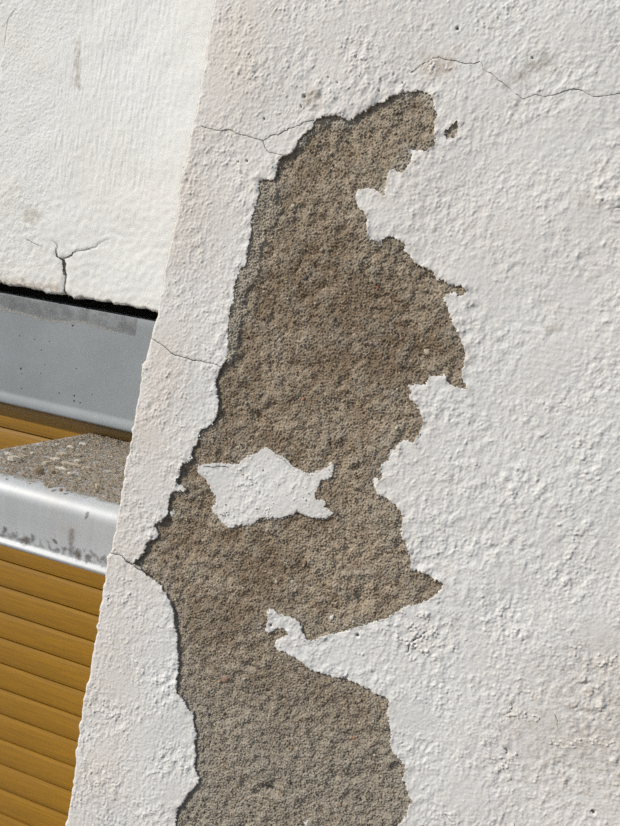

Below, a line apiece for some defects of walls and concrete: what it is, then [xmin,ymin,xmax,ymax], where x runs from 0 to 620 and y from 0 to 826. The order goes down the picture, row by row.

crack [202,120,311,154]
crack [29,239,106,297]
spalling [133,90,468,826]